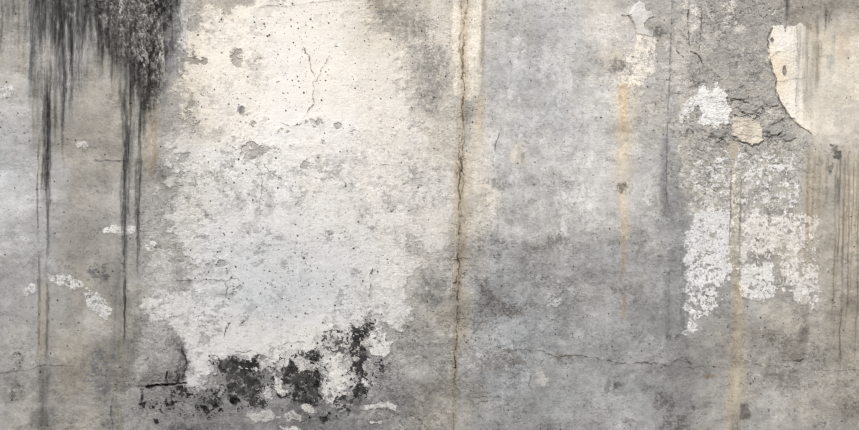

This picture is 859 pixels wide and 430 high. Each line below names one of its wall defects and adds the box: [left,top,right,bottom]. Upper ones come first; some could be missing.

leakage [0,0,397,430]
peeling [140,0,453,430]
crack [445,0,500,430]
crack [494,127,502,151]
crack [494,329,725,369]
flaking render [626,0,834,333]